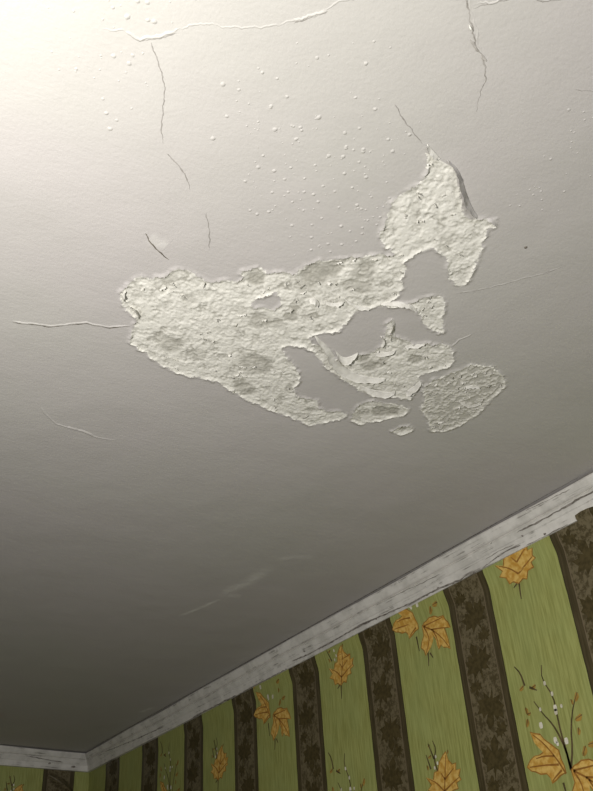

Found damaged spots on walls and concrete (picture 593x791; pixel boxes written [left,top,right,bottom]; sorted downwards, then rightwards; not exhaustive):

crack [101,0,354,188]
crack [466,0,507,103]
crack [12,321,130,329]
peeling [120,144,506,436]